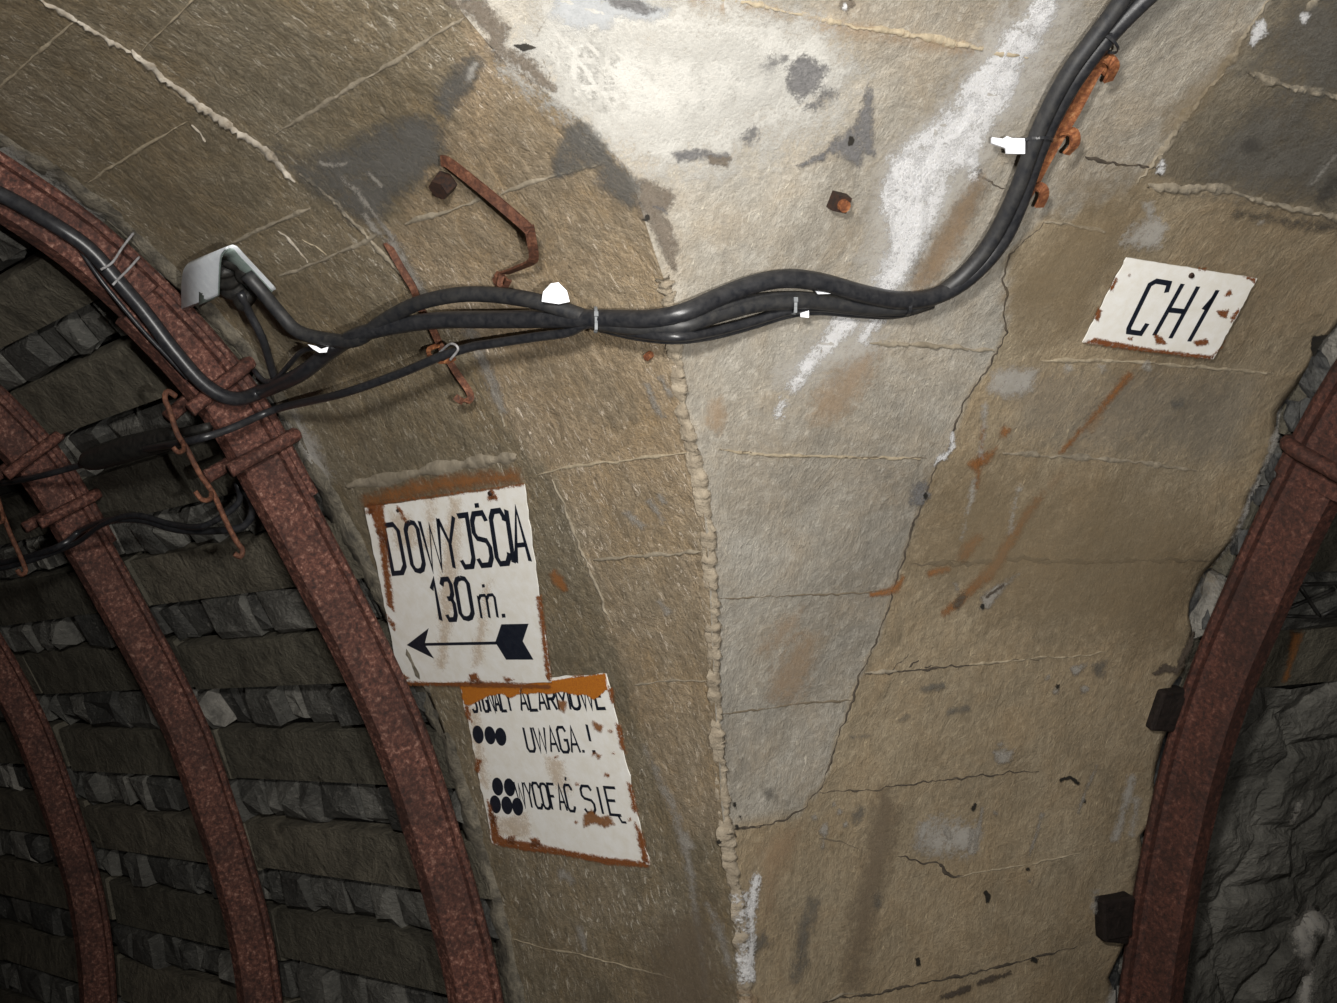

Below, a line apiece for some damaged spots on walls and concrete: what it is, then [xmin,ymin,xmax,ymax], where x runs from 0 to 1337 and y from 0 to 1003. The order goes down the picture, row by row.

leakage [497,0,867,182]
corrosion [364,469,520,506]
crack [718,222,1210,830]
corrosion [942,494,1042,614]